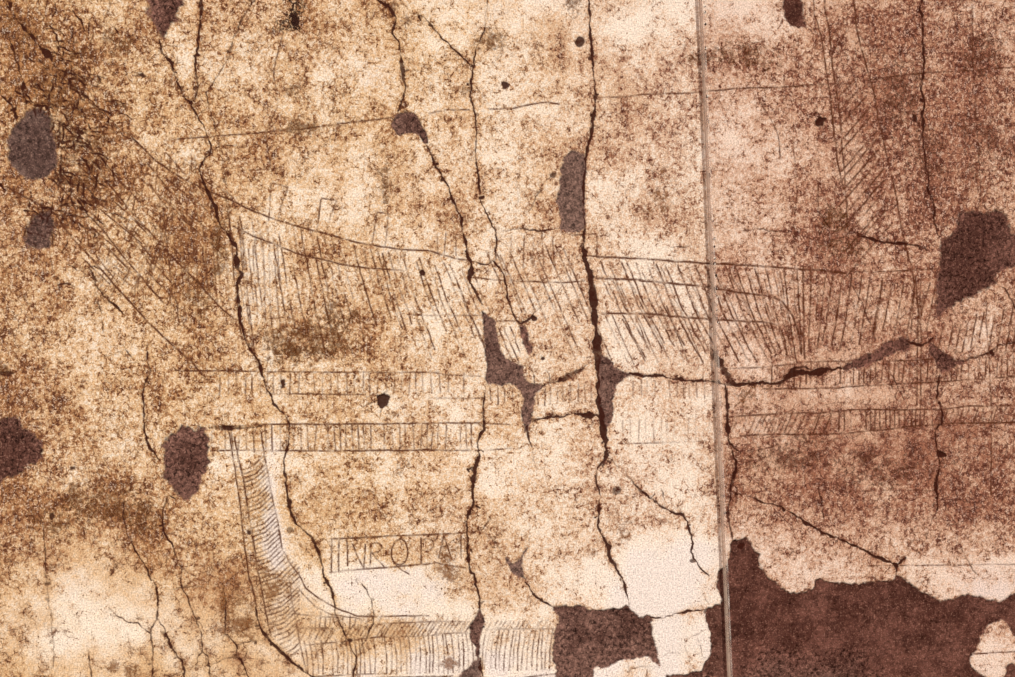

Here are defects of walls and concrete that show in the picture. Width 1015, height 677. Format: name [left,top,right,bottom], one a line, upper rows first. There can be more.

flaking render [142,0,185,42]
flaking render [389,109,430,146]
flaking render [548,148,589,236]
flaking render [933,207,1015,322]
crack [0,0,382,677]
flaking render [479,307,549,434]
crack [371,0,1015,627]
flaking render [0,413,47,487]
flaking render [160,420,265,503]
flaking render [454,607,488,677]
crack [626,661,663,677]
flaking render [550,535,1015,677]